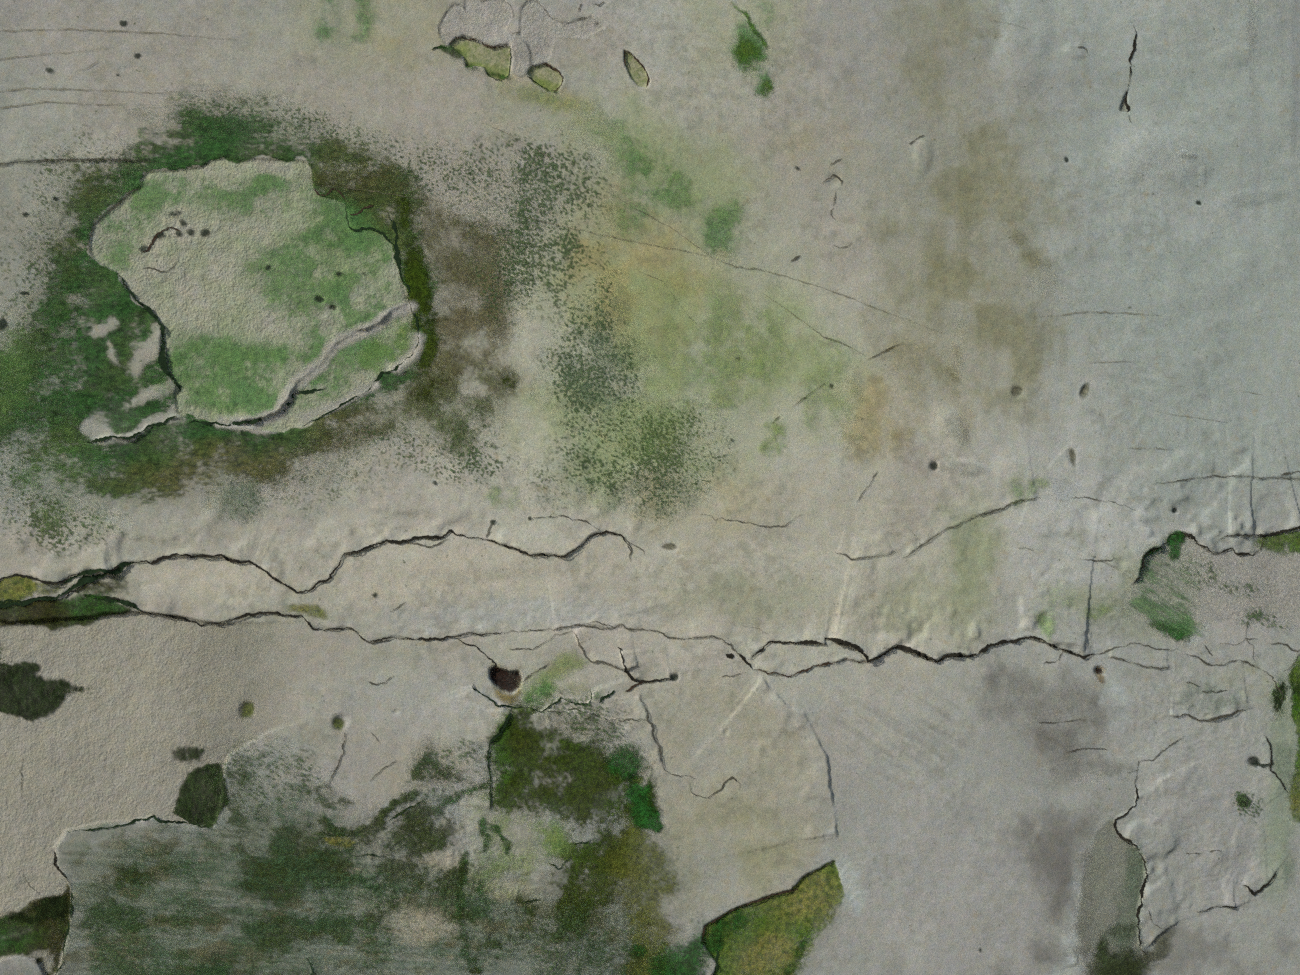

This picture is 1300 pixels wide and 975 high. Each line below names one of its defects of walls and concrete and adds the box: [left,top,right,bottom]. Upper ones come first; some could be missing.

flaking render [432,0,604,93]
crack [1120,24,1137,122]
flaking render [89,158,423,443]
damp [0,96,733,555]
crack [835,496,1131,560]
spalling [1132,530,1287,641]
crack [1154,471,1300,484]
spalling [0,612,237,975]
damp [223,693,706,975]
crack [0,514,1300,975]
damp [81,854,251,975]
spalling [701,860,844,975]